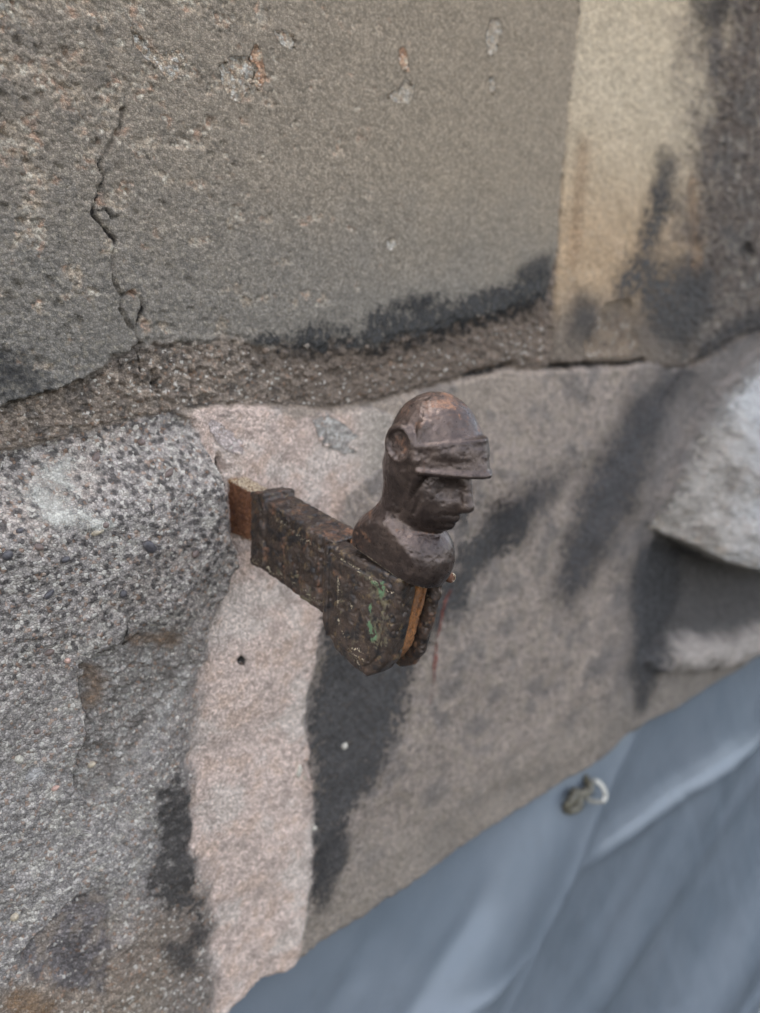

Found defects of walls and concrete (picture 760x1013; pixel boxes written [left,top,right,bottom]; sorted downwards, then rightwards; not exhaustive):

crack [90,162,115,244]
damp [428,474,566,644]
damp [552,365,693,613]
damp [306,617,425,906]